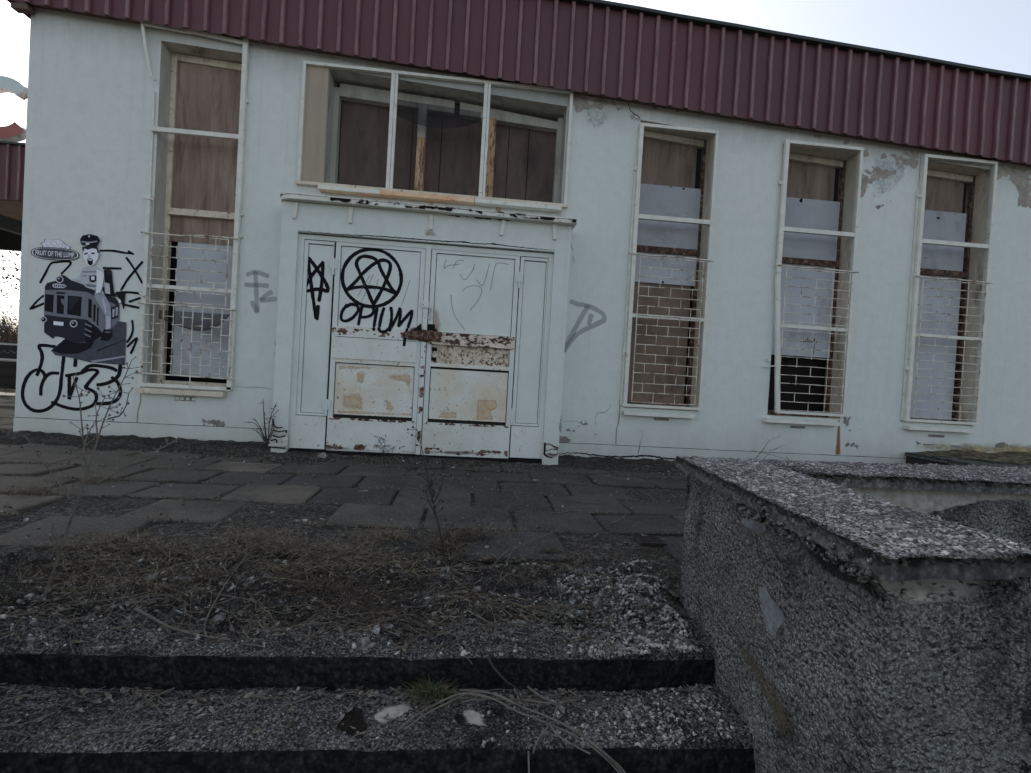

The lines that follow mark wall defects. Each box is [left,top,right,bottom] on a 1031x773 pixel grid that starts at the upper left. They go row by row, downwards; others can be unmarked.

peeling [573,94,635,120]
peeling [860,149,919,198]
peeling [997,165,1031,208]
peeling [394,203,555,221]
peeling [329,345,509,454]